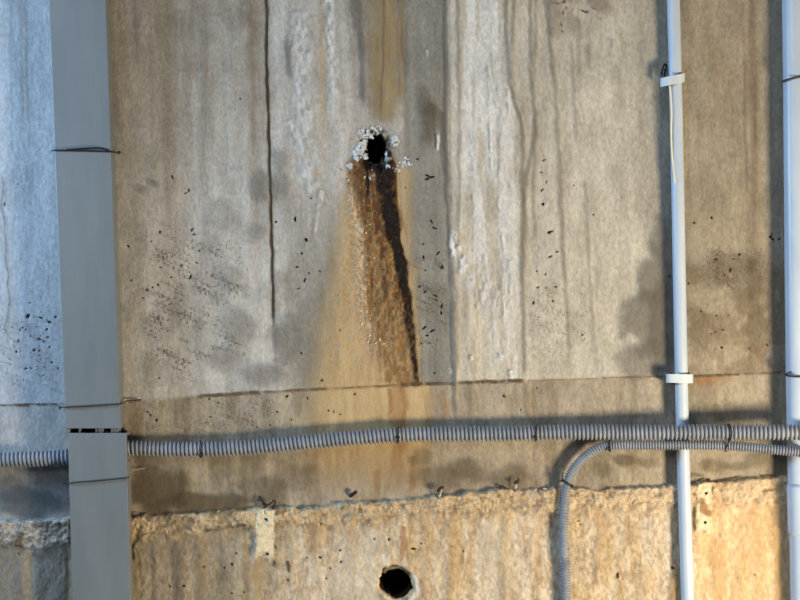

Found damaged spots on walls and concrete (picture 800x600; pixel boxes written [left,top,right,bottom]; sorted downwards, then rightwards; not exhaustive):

crack [265,0,275,319]
rust [311,130,430,436]
rust [316,440,428,472]